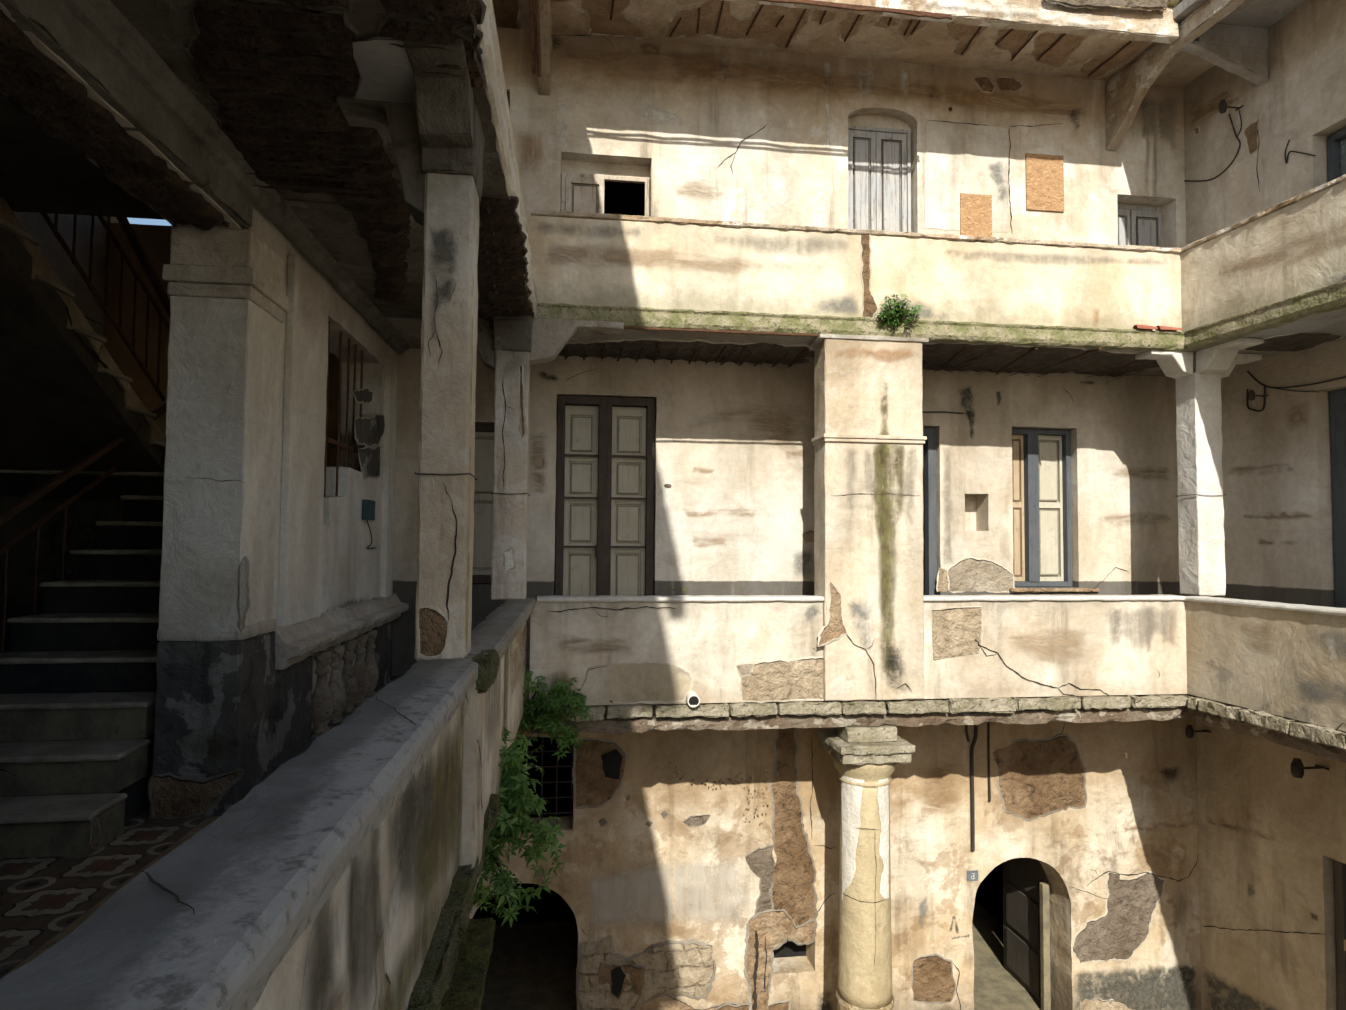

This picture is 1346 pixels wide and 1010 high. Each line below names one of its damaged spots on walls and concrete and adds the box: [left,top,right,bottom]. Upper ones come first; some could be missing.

crack [718,126,765,174]
crack [443,483,457,620]
leakage [875,443,911,613]
flaking render [736,582,847,703]
crack [975,639,1109,737]
flaking render [993,733,1087,822]
leakage [312,901,344,1010]
leakage [353,775,434,992]
flaking render [572,727,818,1010]
flaking render [911,953,956,1004]
flaking render [1071,871,1166,964]
leakage [1078,966,1273,1010]